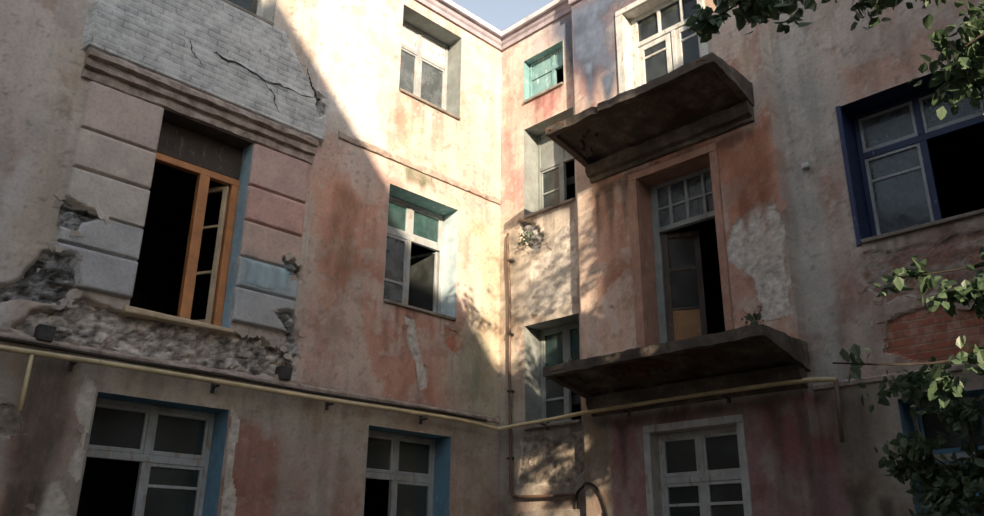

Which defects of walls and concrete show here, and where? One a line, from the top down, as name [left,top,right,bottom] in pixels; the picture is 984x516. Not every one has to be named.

crack [190,41,322,113]
spalling [53,191,112,237]
spalling [0,244,307,381]
flaking render [402,313,428,390]
flaking render [515,217,580,315]
flaking render [726,201,794,321]
spalling [857,228,984,366]
flaking render [25,375,97,516]
flaking render [220,406,240,516]